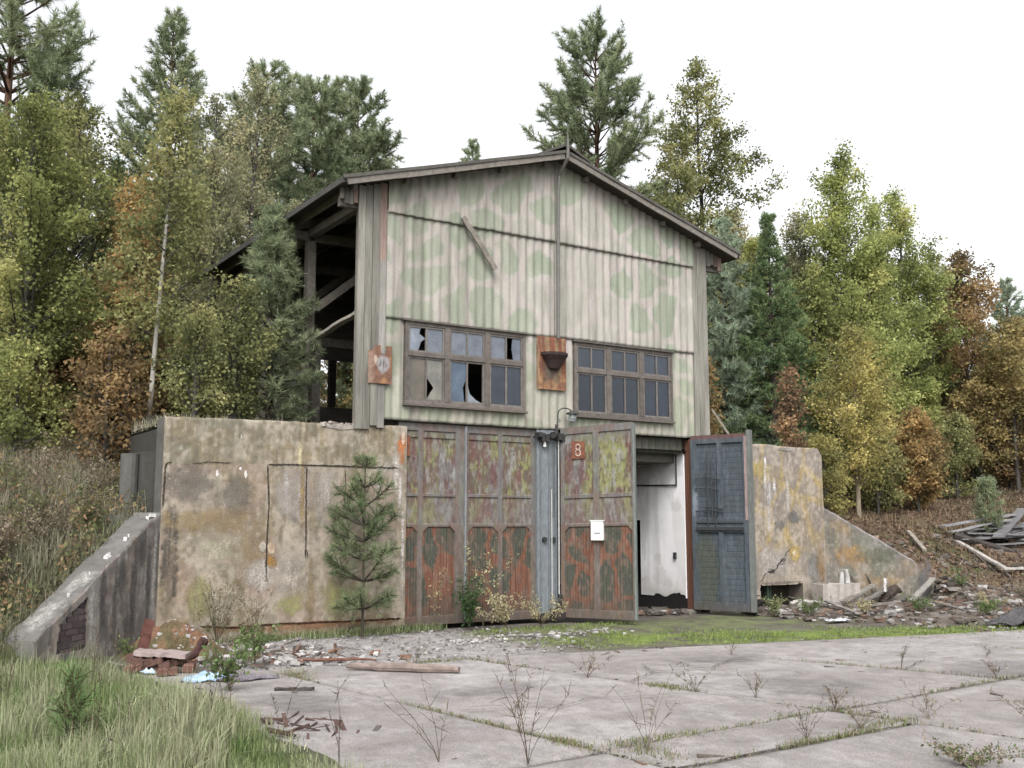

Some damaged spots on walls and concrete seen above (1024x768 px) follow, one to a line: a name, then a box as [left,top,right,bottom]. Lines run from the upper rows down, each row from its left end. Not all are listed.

damp [99,464,275,641]
damp [377,456,404,589]
crack [757,551,789,596]
damp [756,458,799,529]
spalling [56,581,97,655]